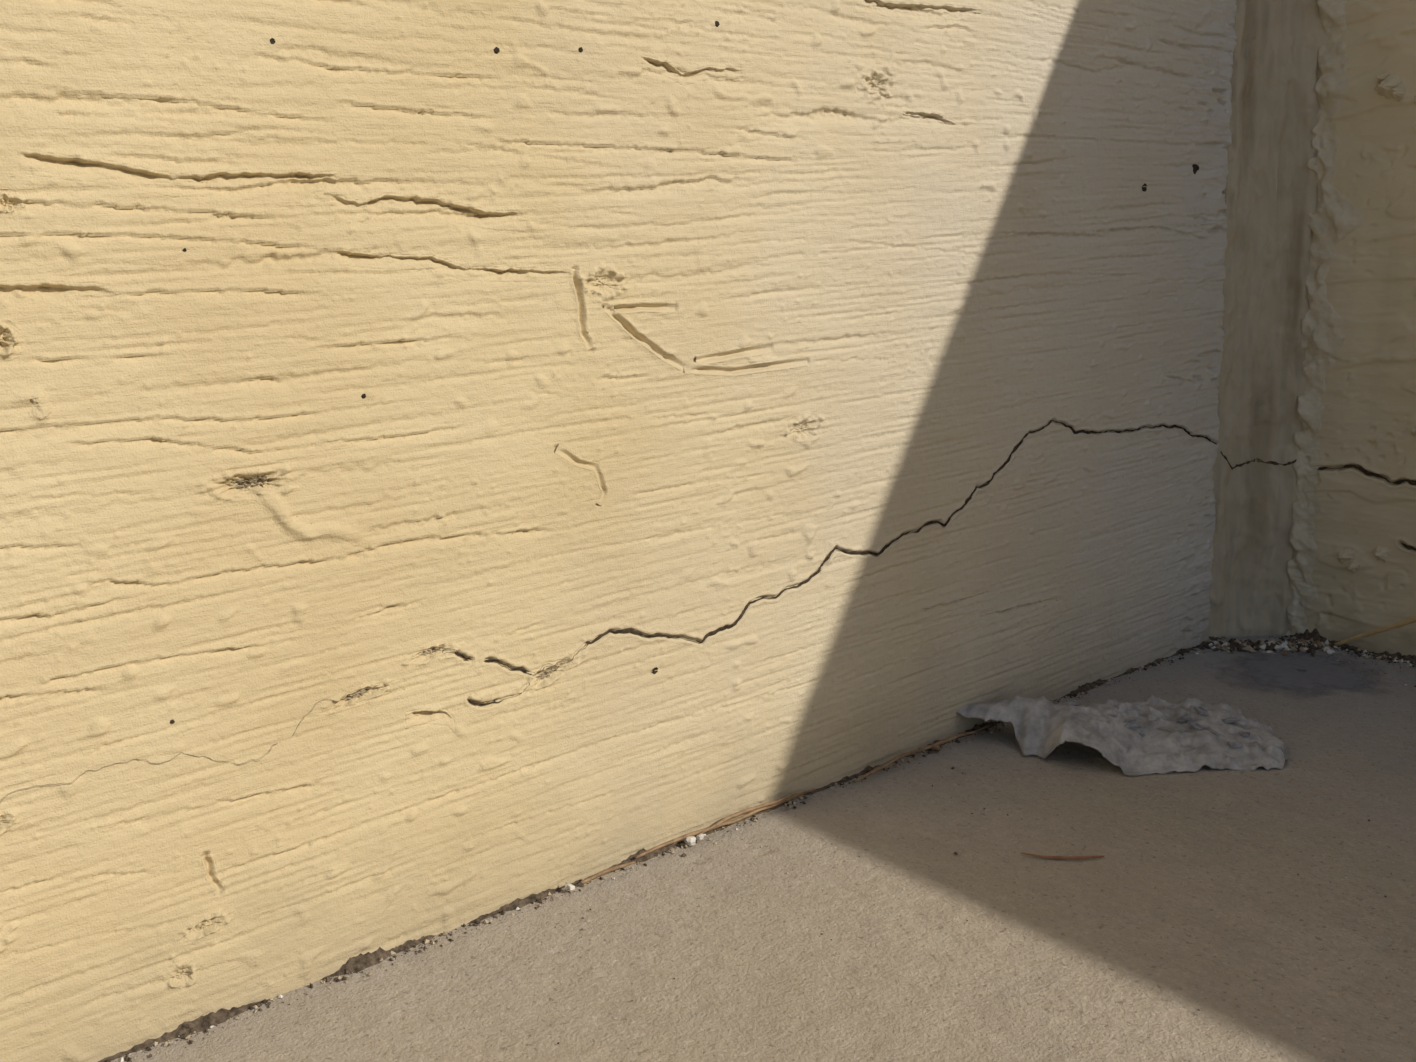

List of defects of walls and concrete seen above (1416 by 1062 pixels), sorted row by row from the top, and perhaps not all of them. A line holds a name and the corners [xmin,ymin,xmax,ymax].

spalling [0,280,122,363]
spalling [185,460,312,505]
crack [442,420,1416,705]
crack [0,687,383,803]